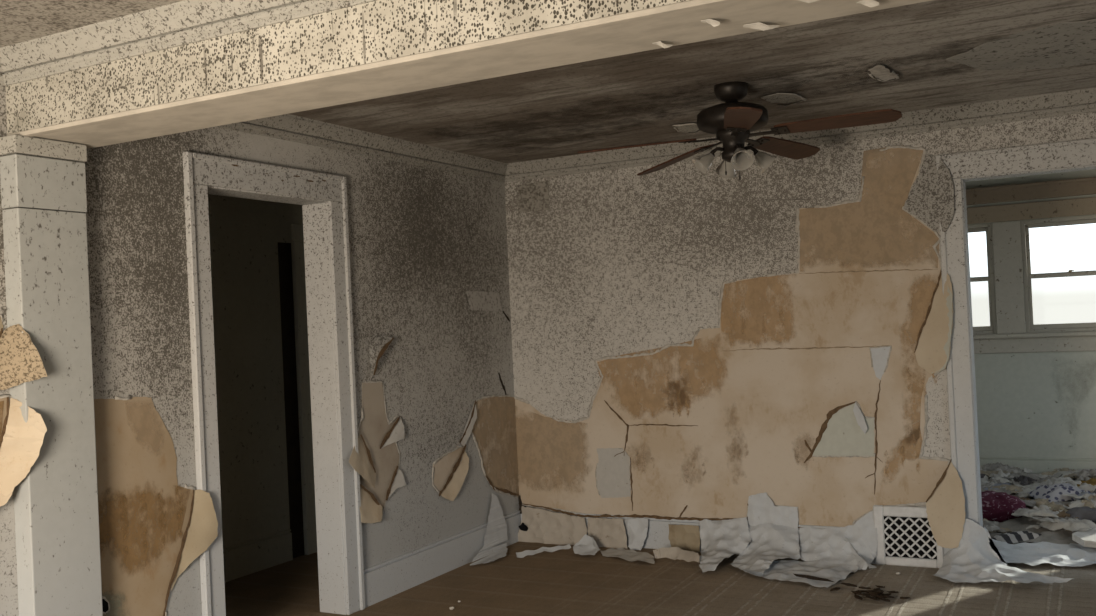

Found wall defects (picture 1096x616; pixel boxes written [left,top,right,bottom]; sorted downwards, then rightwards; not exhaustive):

peeling [0,314,48,507]
leakage [98,486,188,573]
peeling [94,395,218,616]
peeling [349,335,406,523]
peeling [432,400,477,501]
peeling [514,145,966,548]